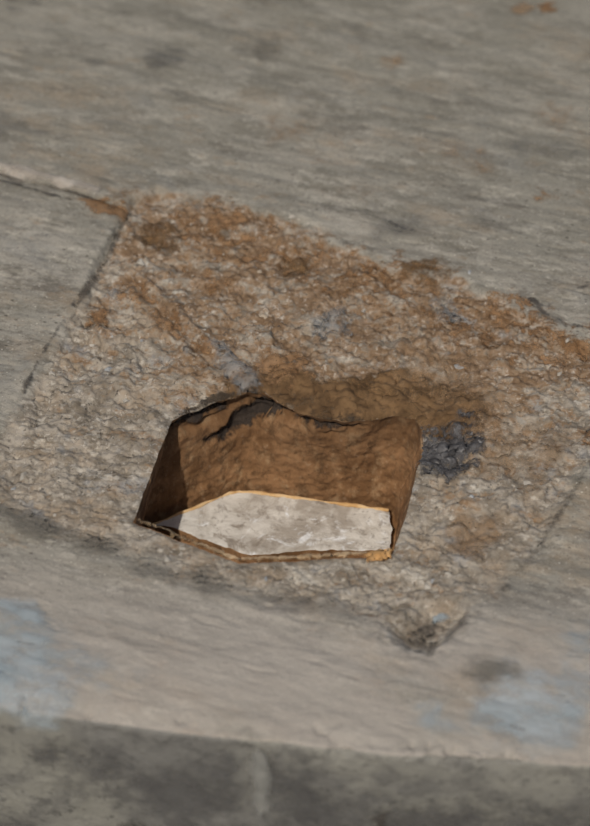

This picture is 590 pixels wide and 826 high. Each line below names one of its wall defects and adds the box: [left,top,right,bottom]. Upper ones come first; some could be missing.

rust [78,197,129,222]
spalling [0,190,590,651]